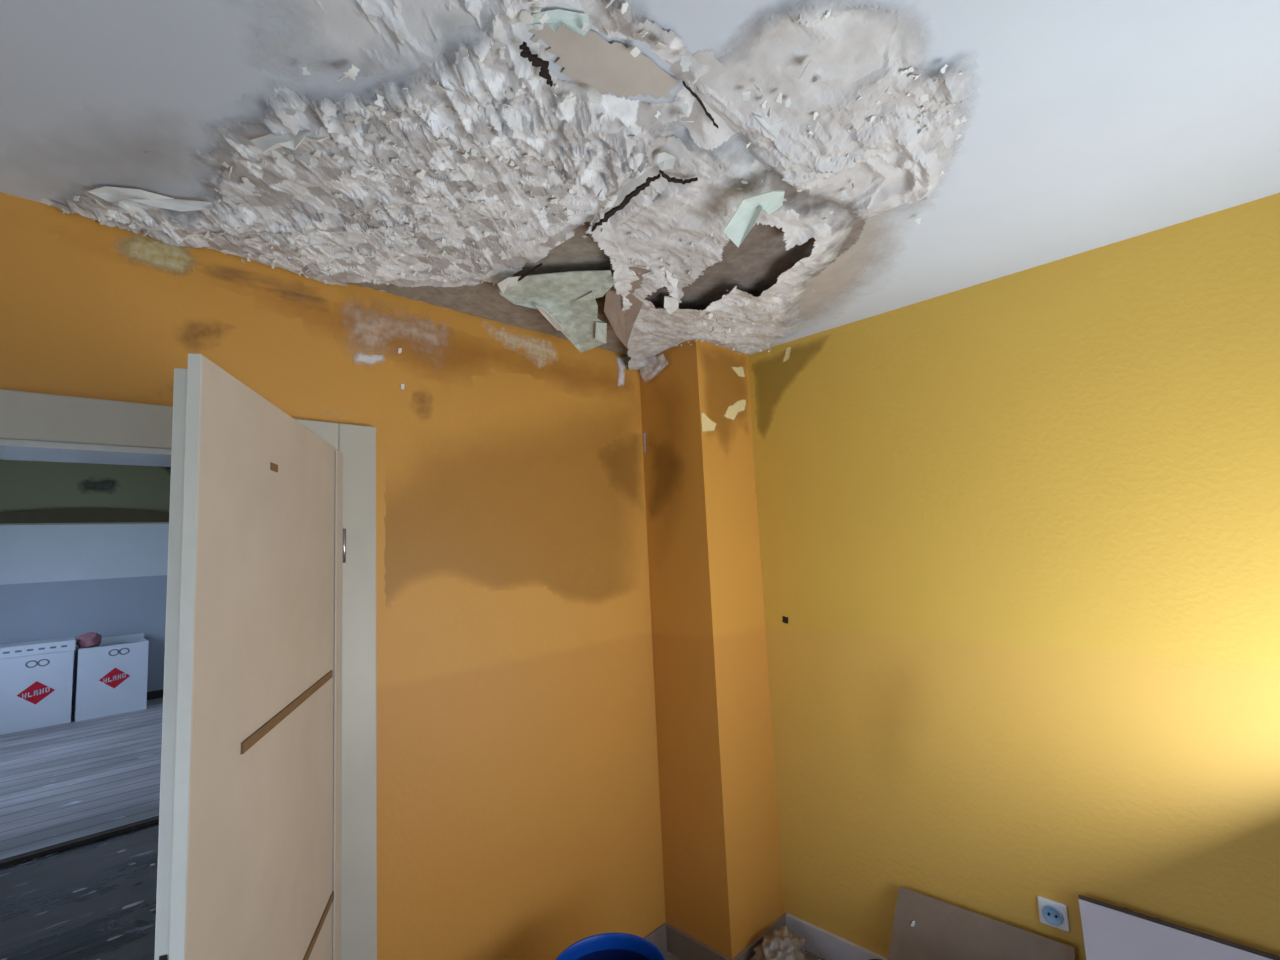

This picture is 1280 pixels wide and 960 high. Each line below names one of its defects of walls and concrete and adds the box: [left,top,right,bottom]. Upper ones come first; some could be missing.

crack [683,81,718,128]
peeling [857,64,967,140]
peeling [40,0,867,385]
crack [586,170,698,236]
crack [518,263,542,281]
peeling [701,399,746,432]